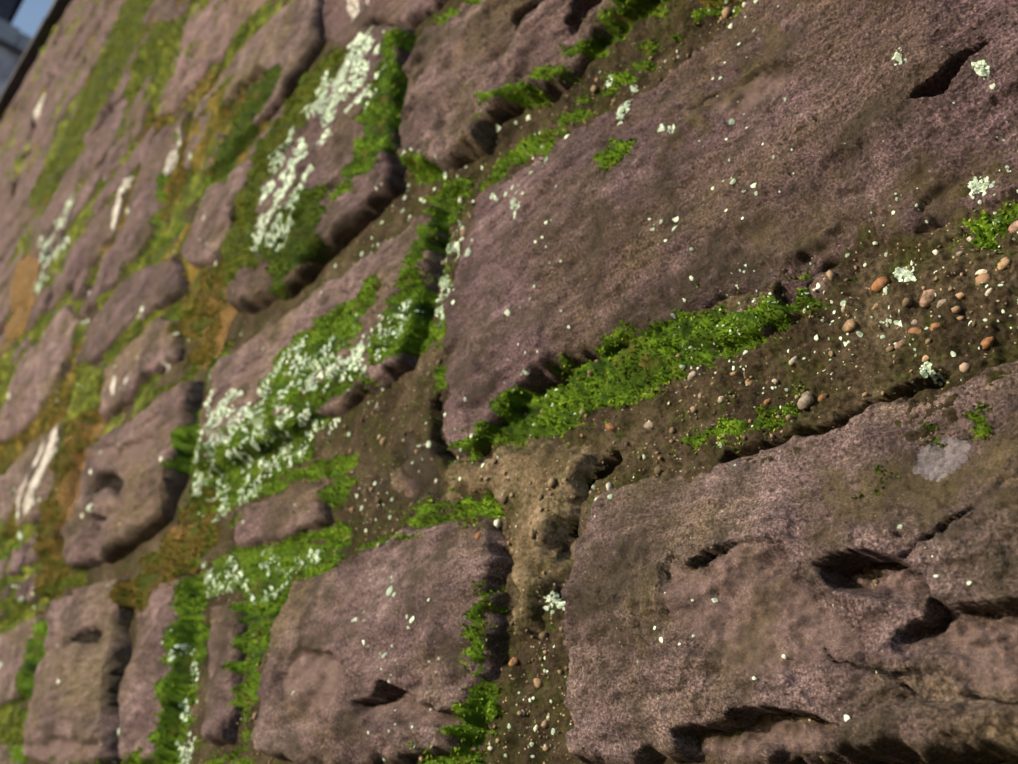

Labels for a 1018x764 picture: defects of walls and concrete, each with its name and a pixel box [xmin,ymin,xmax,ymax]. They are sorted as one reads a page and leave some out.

crack [902,508,974,577]
crack [823,647,922,694]
crack [966,694,1018,706]